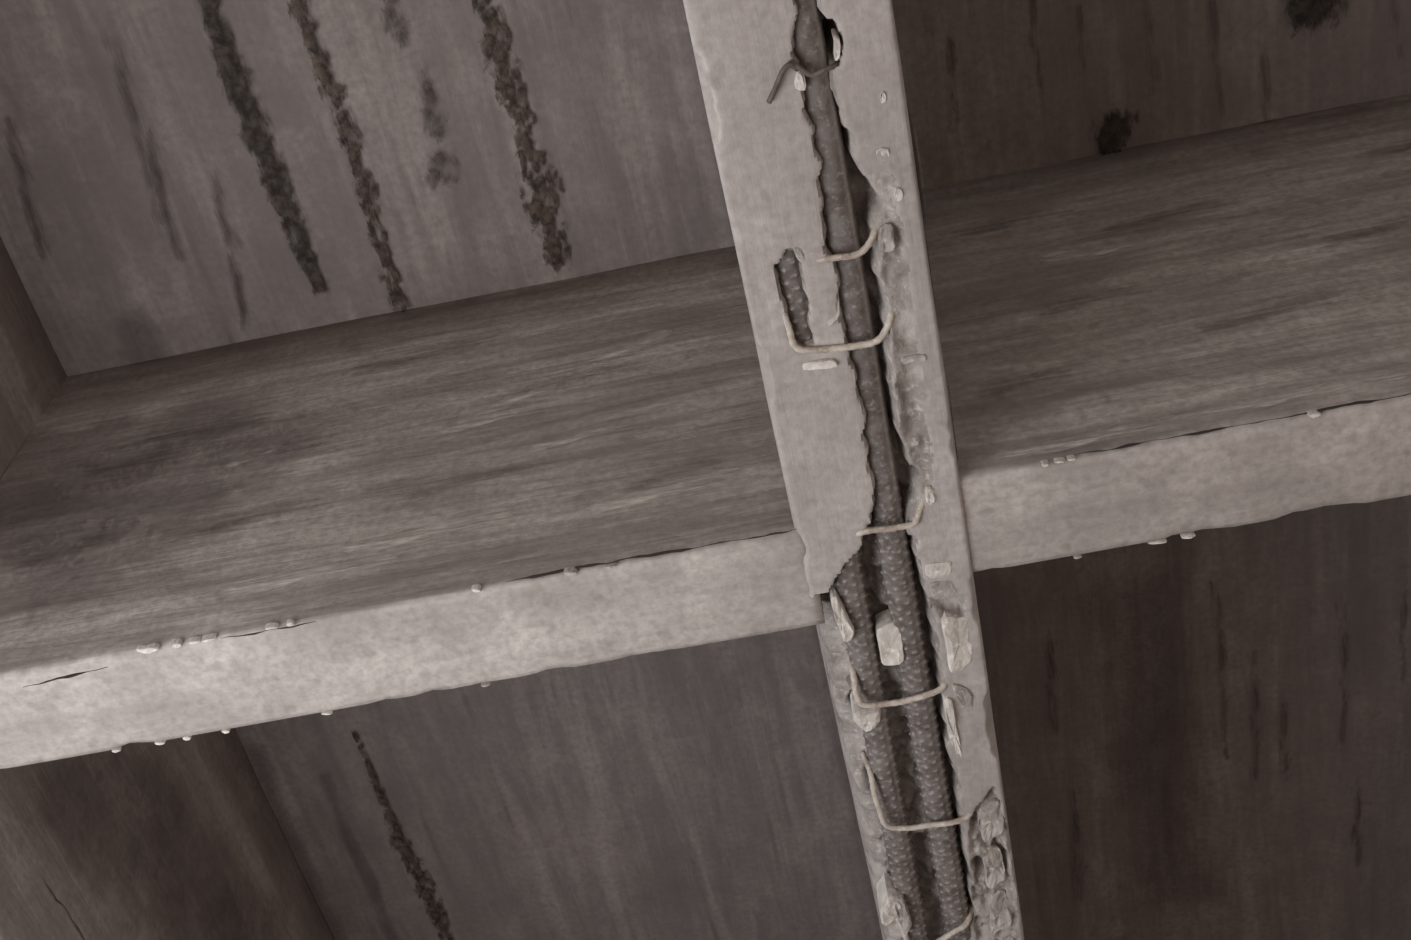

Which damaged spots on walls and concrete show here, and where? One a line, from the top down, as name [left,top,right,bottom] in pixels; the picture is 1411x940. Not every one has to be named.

leakage [198,0,326,294]
leakage [286,0,410,312]
leakage [422,81,457,184]
leakage [472,0,572,272]
mould [1096,109,1138,156]
mould [1286,0,1348,37]
spalling [773,0,1022,940]
leakage [352,732,453,940]